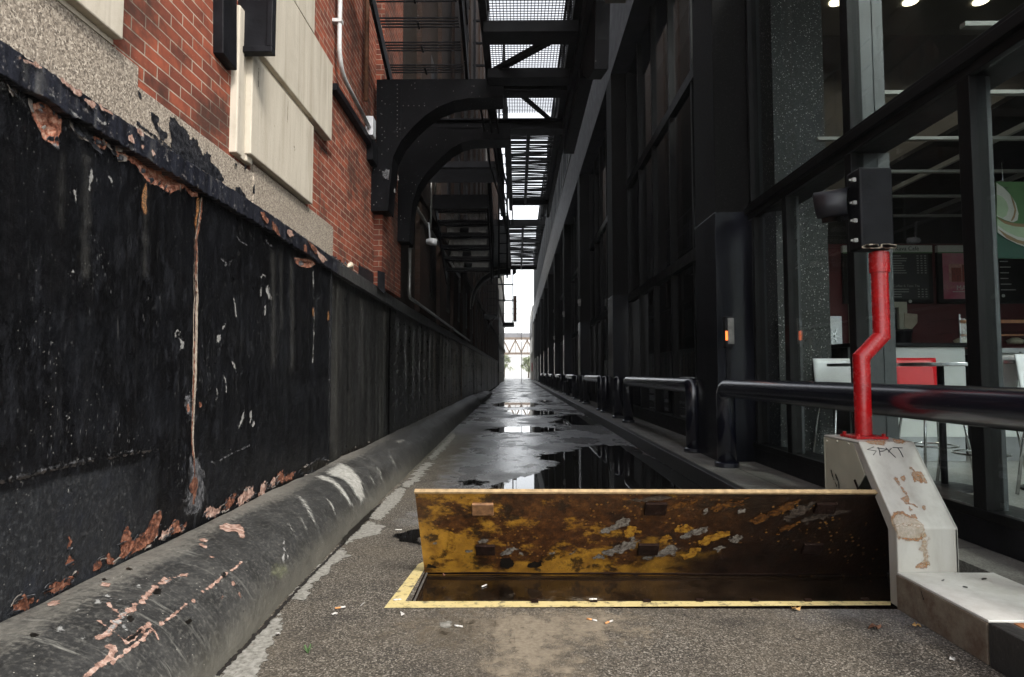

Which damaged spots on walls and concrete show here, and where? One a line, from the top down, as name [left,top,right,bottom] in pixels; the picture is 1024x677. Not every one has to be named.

spalling [0,77,198,197]
peeling [8,536,78,616]
peeling [93,510,187,587]
peeling [592,508,708,560]
peeling [713,534,744,553]
corrosion [891,467,930,568]